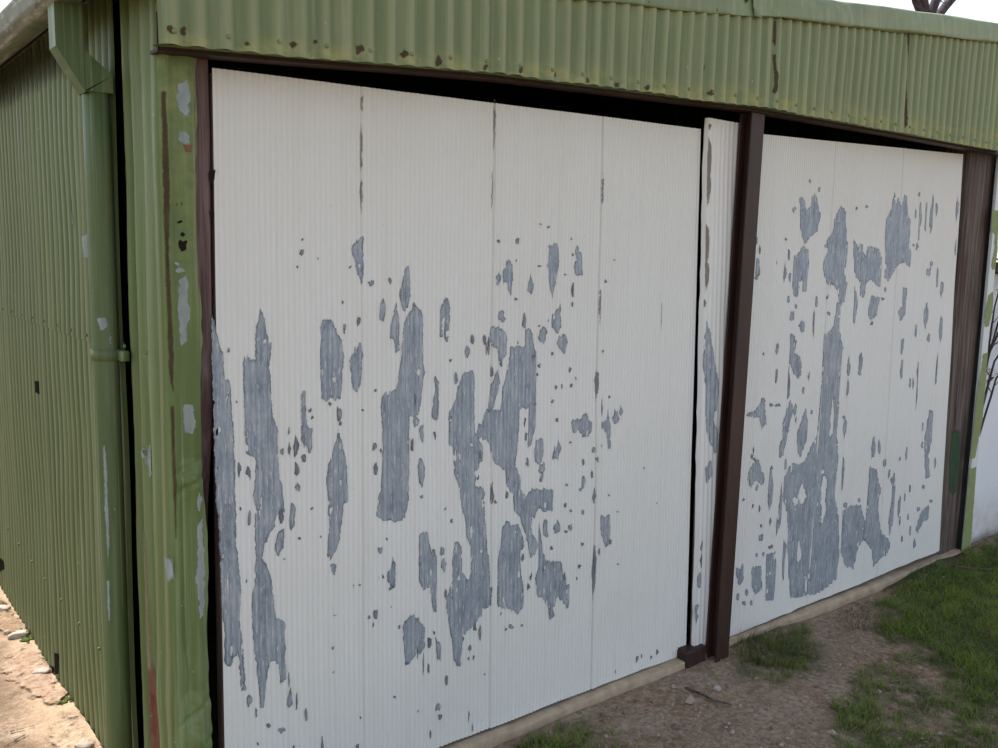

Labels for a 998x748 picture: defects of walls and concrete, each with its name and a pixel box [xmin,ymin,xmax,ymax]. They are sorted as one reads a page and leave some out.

peeling [176,80,191,116]
peeling [178,132,190,145]
peeling [174,262,190,345]
peeling [349,236,374,286]
peeling [195,493,206,618]
peeling [211,309,314,721]
peeling [320,317,363,575]
peeling [372,238,623,673]
peeling [703,322,719,483]
peeling [736,179,944,606]
corrosion [143,537,160,748]